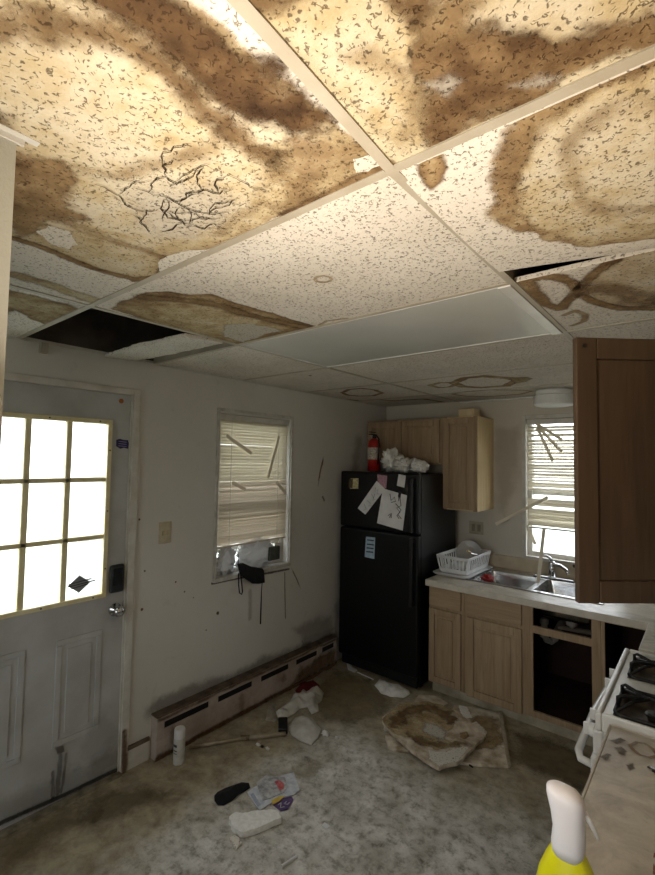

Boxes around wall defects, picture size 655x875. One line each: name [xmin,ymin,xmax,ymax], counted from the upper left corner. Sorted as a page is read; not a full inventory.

damp [249,0,655,147]
crack [95,145,268,232]
damp [0,0,395,282]
damp [418,155,447,190]
damp [487,61,655,247]
damp [111,291,347,344]
damp [518,251,655,326]
damp [428,375,532,397]